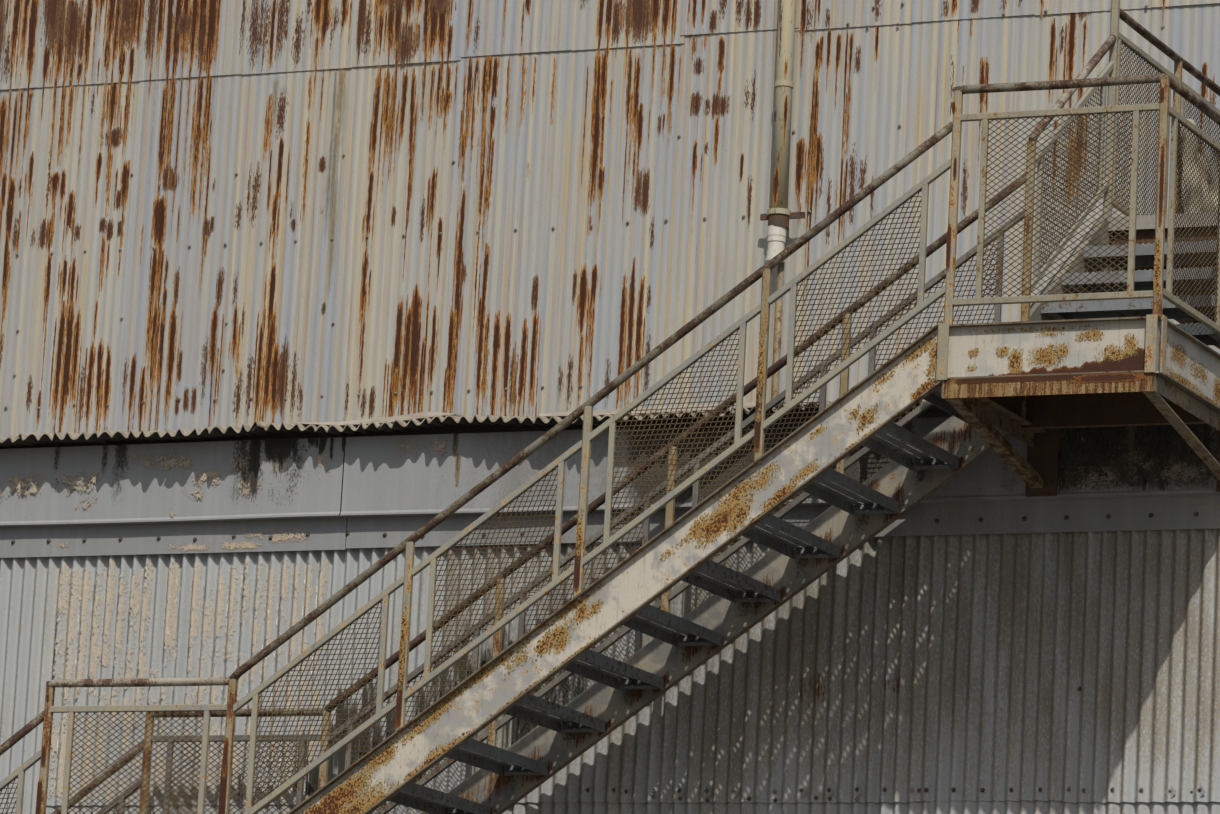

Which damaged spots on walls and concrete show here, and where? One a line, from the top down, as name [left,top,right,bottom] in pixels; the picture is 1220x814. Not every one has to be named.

rust [941,0,979,39]
rust [580,0,761,247]
rust [772,0,882,303]
rust [0,0,541,434]
rust [558,257,651,409]
rust [840,325,1220,454]
water stain [102,445,129,492]
water stain [233,437,346,499]
rust [660,459,829,561]
water stain [1057,424,1218,491]
rust [302,510,603,814]
rust [218,737,229,814]